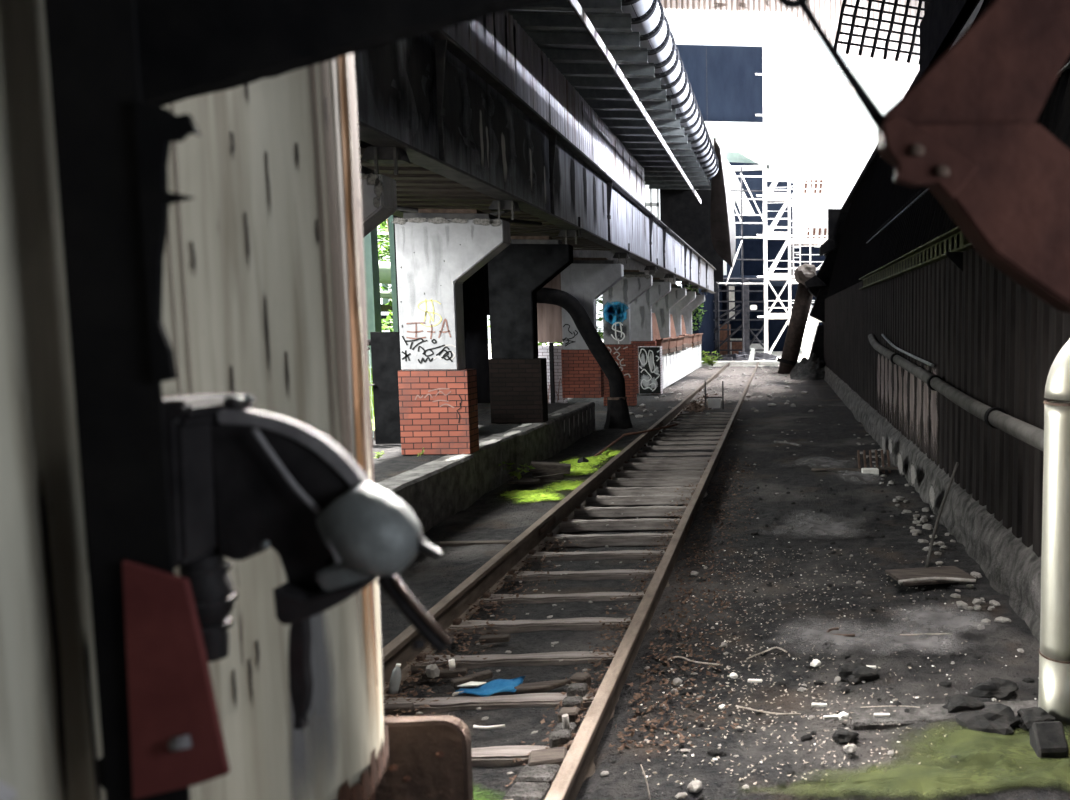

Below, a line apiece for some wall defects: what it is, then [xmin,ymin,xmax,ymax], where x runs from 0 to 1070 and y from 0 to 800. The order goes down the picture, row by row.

damp [469,14,516,72]
corrosion [339,53,374,484]
corrosion [363,578,378,666]